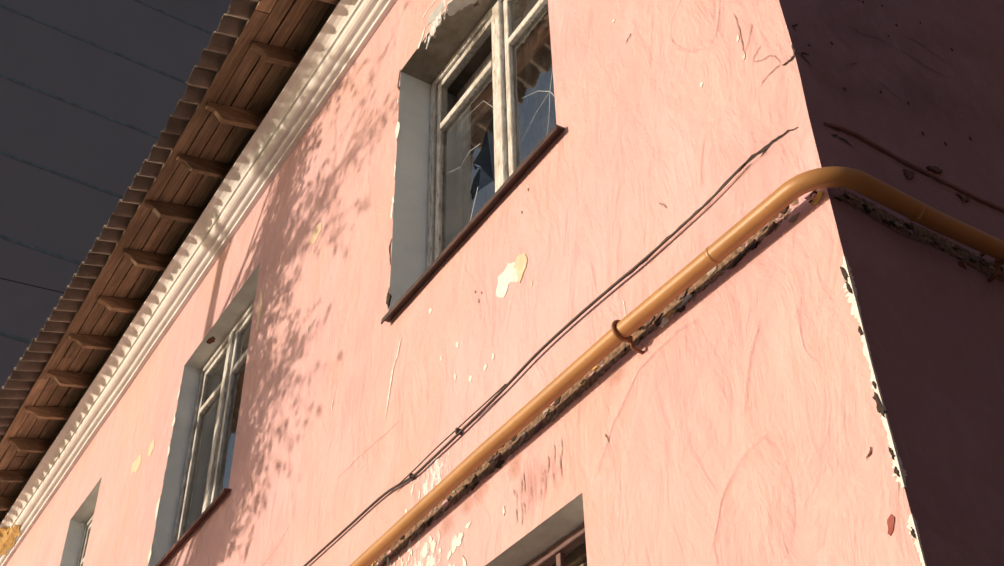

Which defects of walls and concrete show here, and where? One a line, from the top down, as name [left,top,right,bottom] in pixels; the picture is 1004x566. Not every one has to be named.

flaking render [418,0,490,49]
flaking render [370,190,1004,566]
flaking render [0,524,21,555]